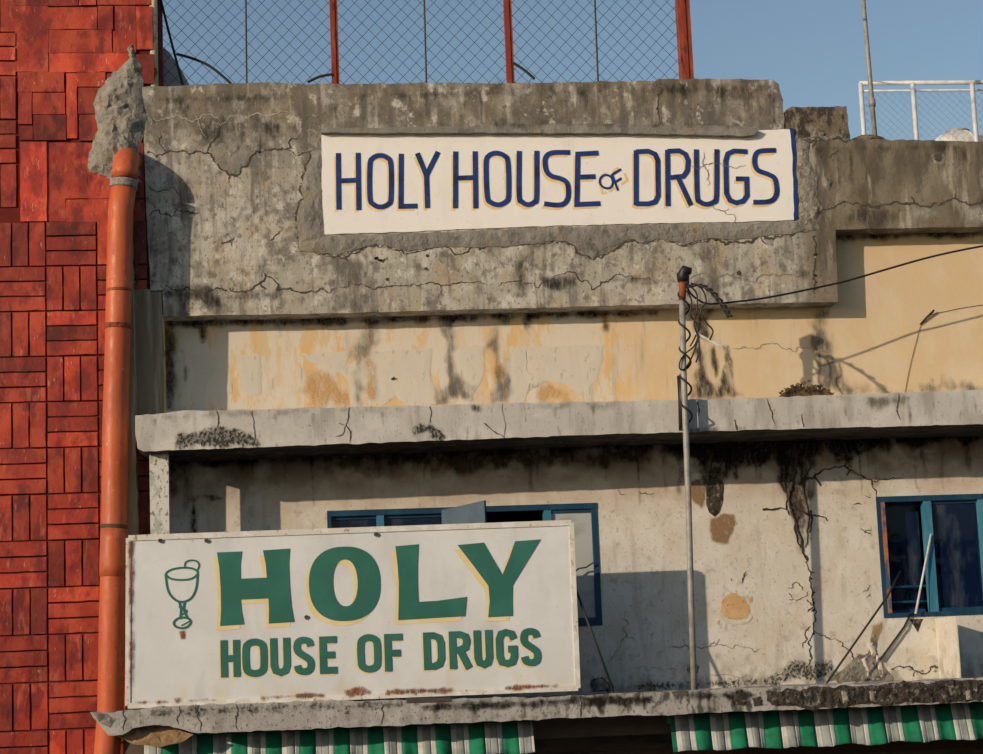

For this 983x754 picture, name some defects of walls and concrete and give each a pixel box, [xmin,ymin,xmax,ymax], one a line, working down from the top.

crack [133,111,983,300]
water stain [165,260,362,394]
peeling [296,348,437,407]
water stain [692,348,735,398]
water stain [175,427,260,449]
spalling [691,469,735,543]
water stain [665,428,983,528]
crack [838,457,902,505]
peeling [717,593,753,625]
crack [789,557,854,675]
crack [646,642,758,671]
spalling [733,631,983,711]